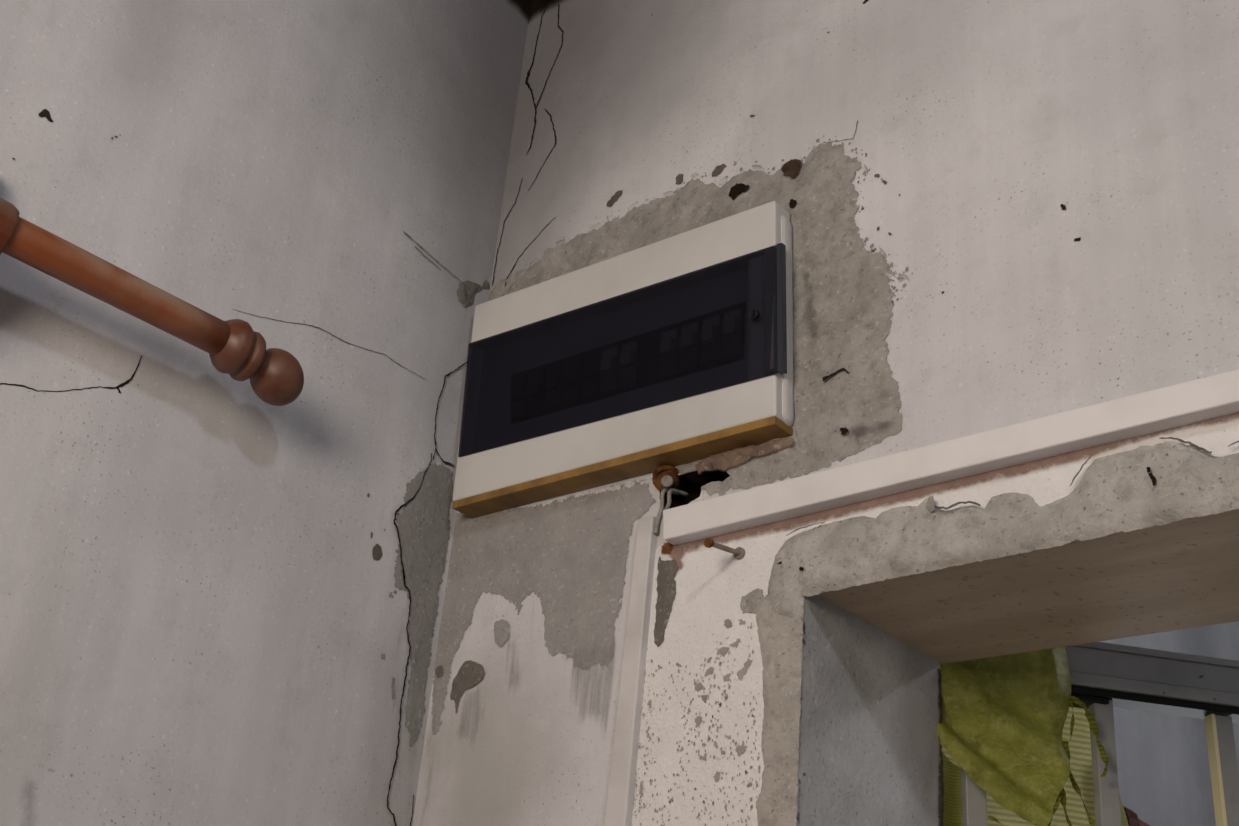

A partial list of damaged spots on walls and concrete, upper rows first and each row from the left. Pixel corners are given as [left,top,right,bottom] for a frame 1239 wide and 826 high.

crack [492,4,564,286]
crack [0,355,142,393]
flaking render [371,135,913,747]
flaking render [633,557,764,826]